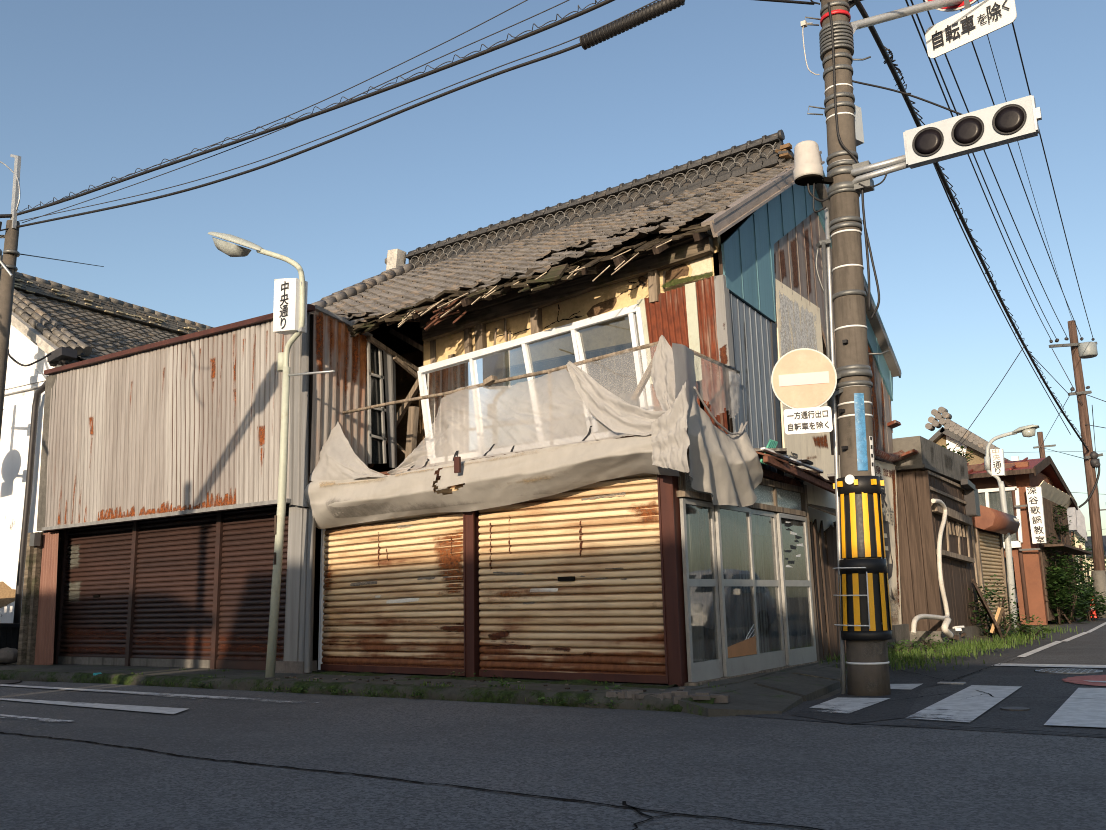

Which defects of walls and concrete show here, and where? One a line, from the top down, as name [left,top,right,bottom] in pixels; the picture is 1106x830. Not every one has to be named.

corrosion [199,336,276,404]
corrosion [257,426,265,465]
corrosion [57,479,236,525]
corrosion [632,503,659,522]
corrosion [435,530,463,594]
flaking render [0,581,16,617]